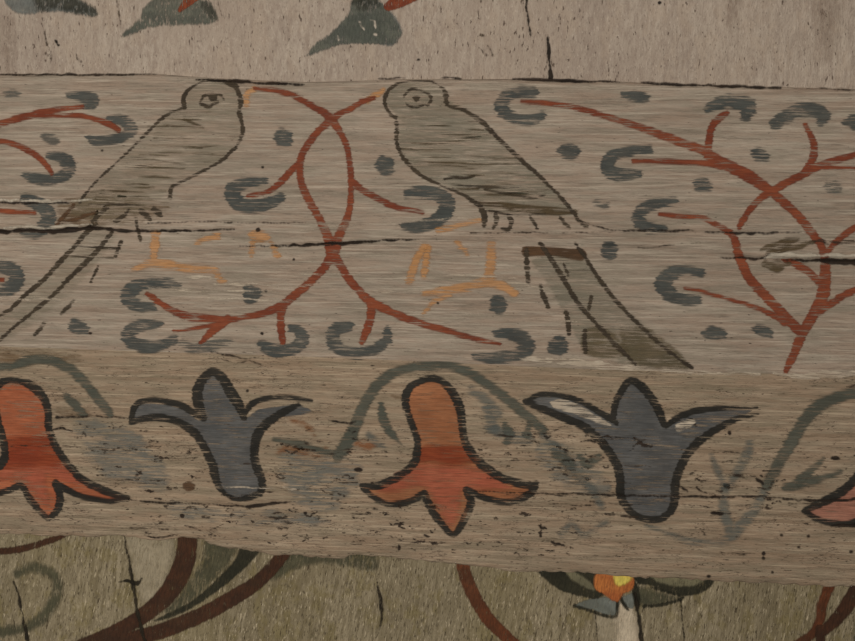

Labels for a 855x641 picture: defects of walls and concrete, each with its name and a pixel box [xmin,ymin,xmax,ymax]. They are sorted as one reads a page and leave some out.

crack [512,0,613,83]
crack [1,70,154,78]
crack [196,78,303,86]
crack [642,81,781,89]
crack [0,199,235,234]
crack [249,222,412,247]
crack [576,225,855,272]
crack [118,479,296,641]